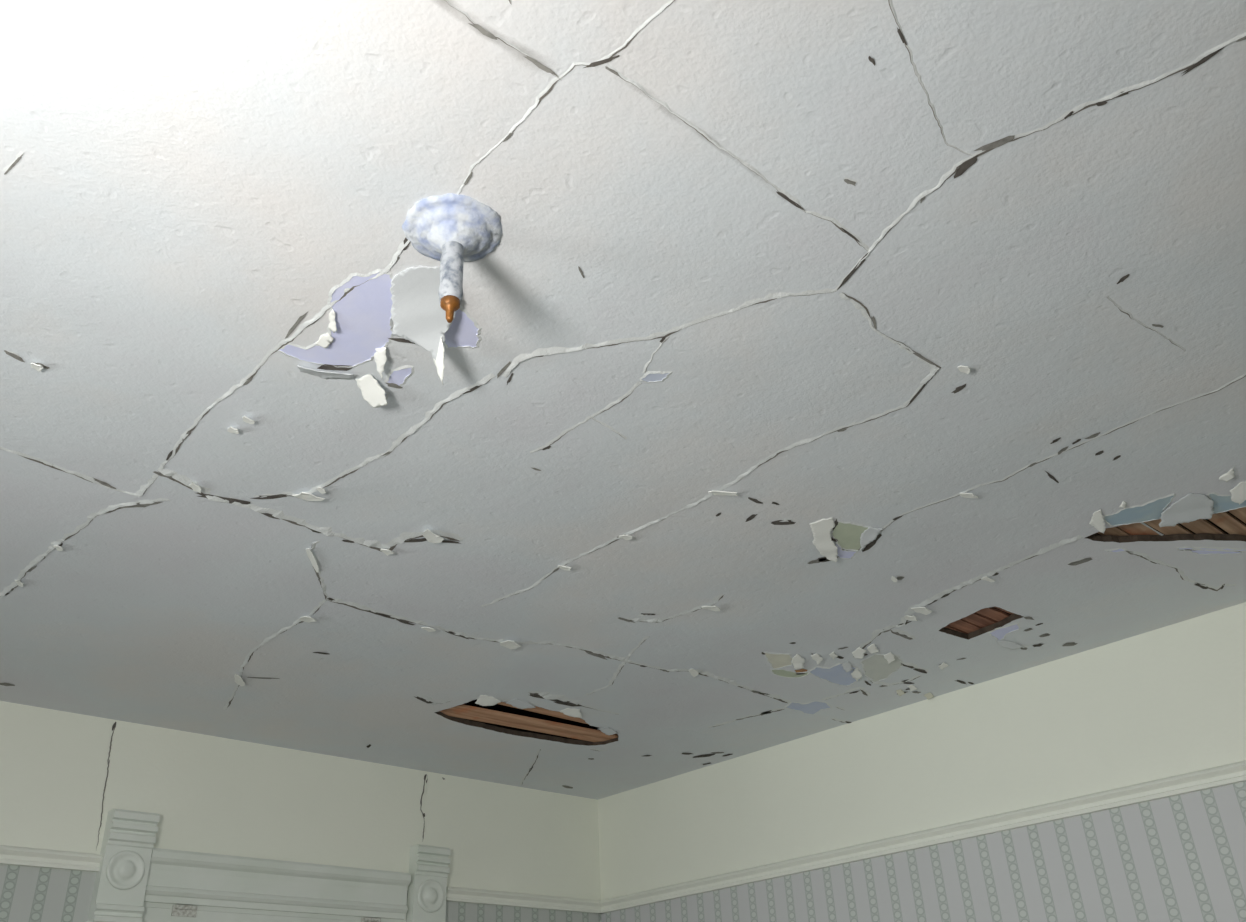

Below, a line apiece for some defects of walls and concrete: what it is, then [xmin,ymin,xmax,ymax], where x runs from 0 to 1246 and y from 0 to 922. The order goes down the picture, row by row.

peeling [278,266,482,408]
crack [0,0,1246,728]
peeling [746,497,883,564]
flaking render [1085,468,1246,555]
flaking render [939,607,1050,650]
peeling [762,642,966,723]
flaking render [435,695,619,760]
crack [96,721,117,851]